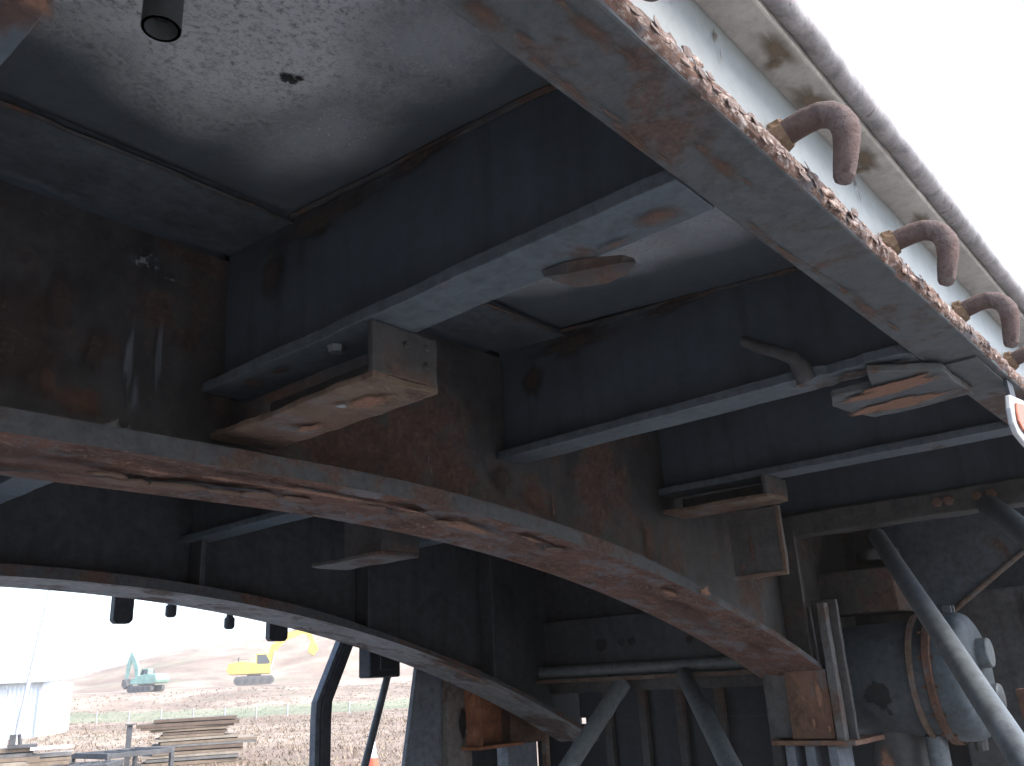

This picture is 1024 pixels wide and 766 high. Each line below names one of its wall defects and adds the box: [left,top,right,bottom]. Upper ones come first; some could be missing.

corrosion [604,0,1024,389]
corrosion [843,374,950,416]
corrosion [206,476,378,504]
crack [360,502,453,524]